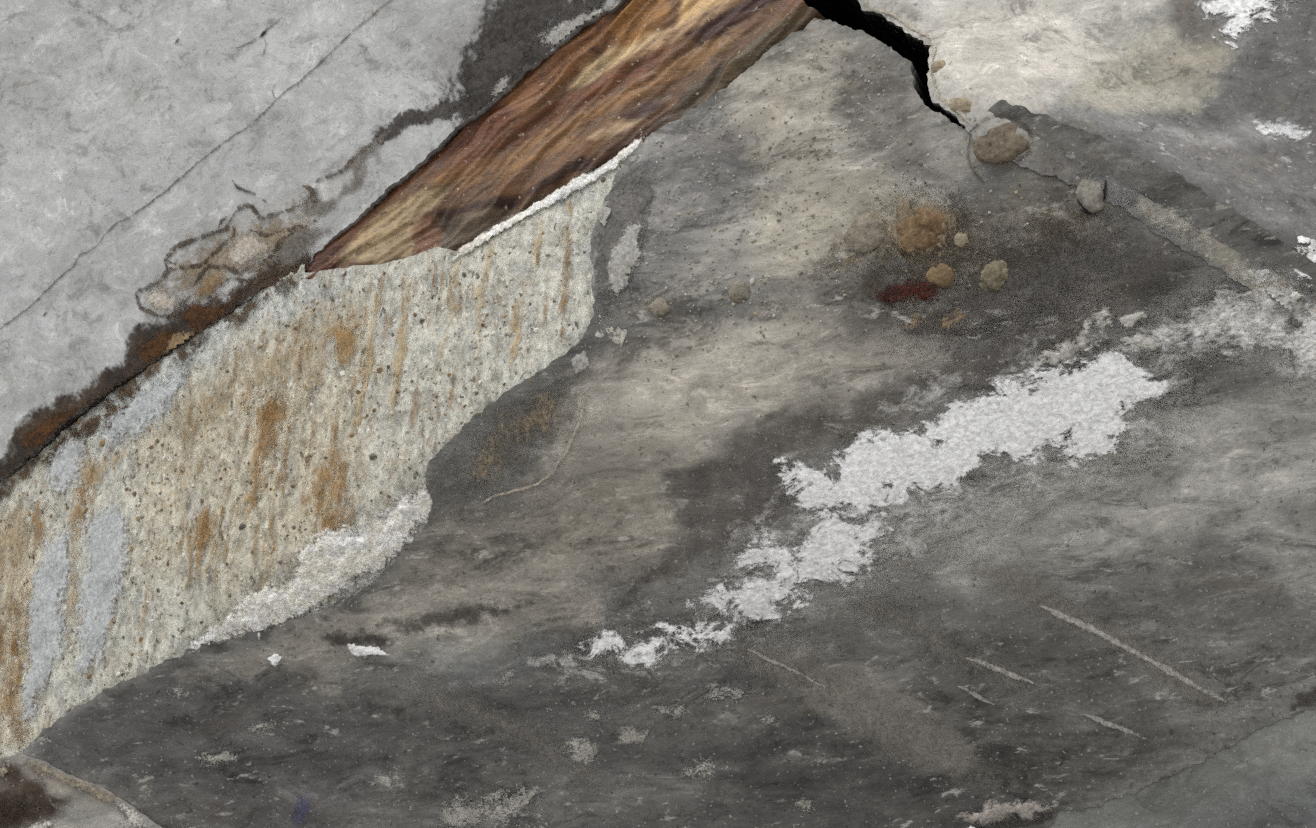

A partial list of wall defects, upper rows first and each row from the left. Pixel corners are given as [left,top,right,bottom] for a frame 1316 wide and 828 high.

crack [832,0,935,108]
leakage [1197,0,1288,49]
crack [4,1,389,326]
leakage [1253,121,1311,140]
corrosion [529,201,573,384]
leakage [850,187,1179,322]
corrosion [0,246,521,742]
spalling [0,141,655,777]
leakage [529,235,1316,679]
leakage [198,750,238,767]
leakage [438,785,547,828]
leakage [561,737,597,765]